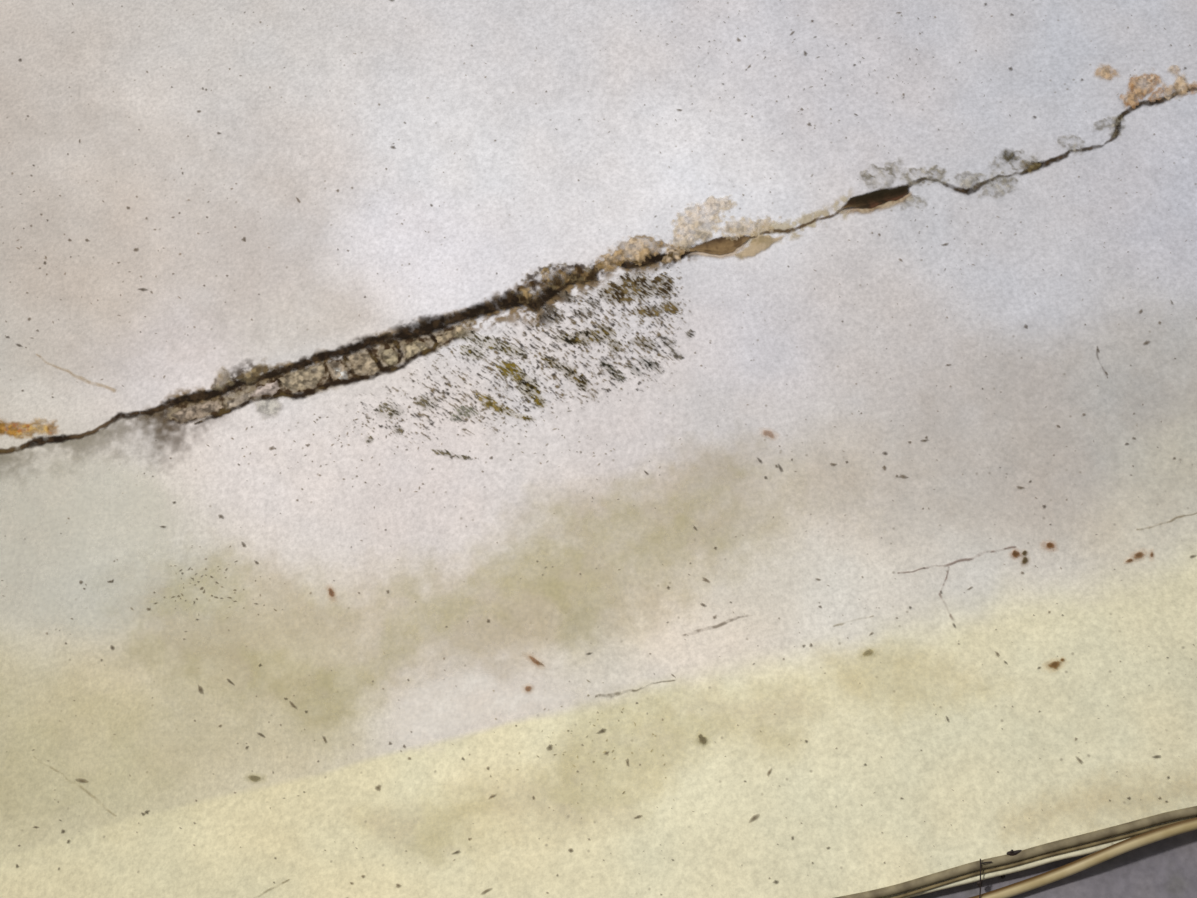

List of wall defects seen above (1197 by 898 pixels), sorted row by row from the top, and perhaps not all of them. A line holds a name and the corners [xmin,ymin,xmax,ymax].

corrosion [1096,66,1116,79]
corrosion [1120,65,1191,109]
crack [0,85,1197,454]
mould [361,267,695,460]
corrosion [0,420,56,438]